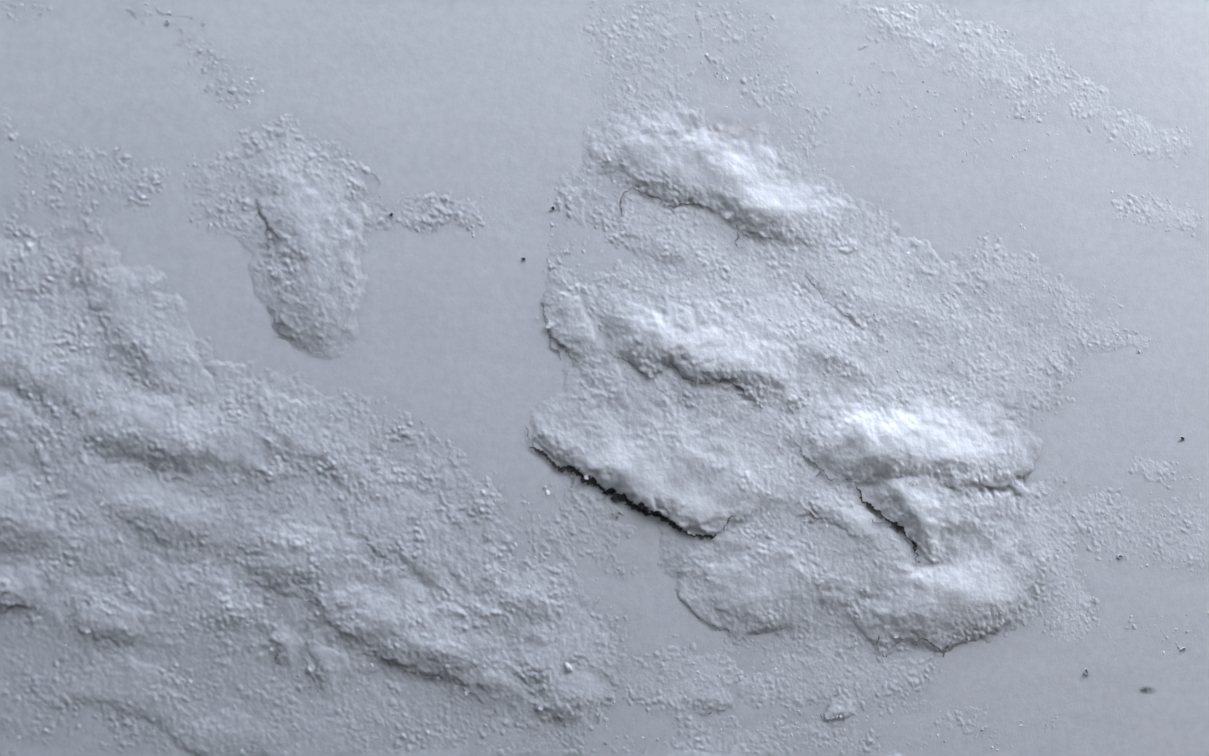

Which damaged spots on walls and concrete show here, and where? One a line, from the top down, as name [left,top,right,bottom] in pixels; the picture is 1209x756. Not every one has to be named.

crack [790,437,921,563]